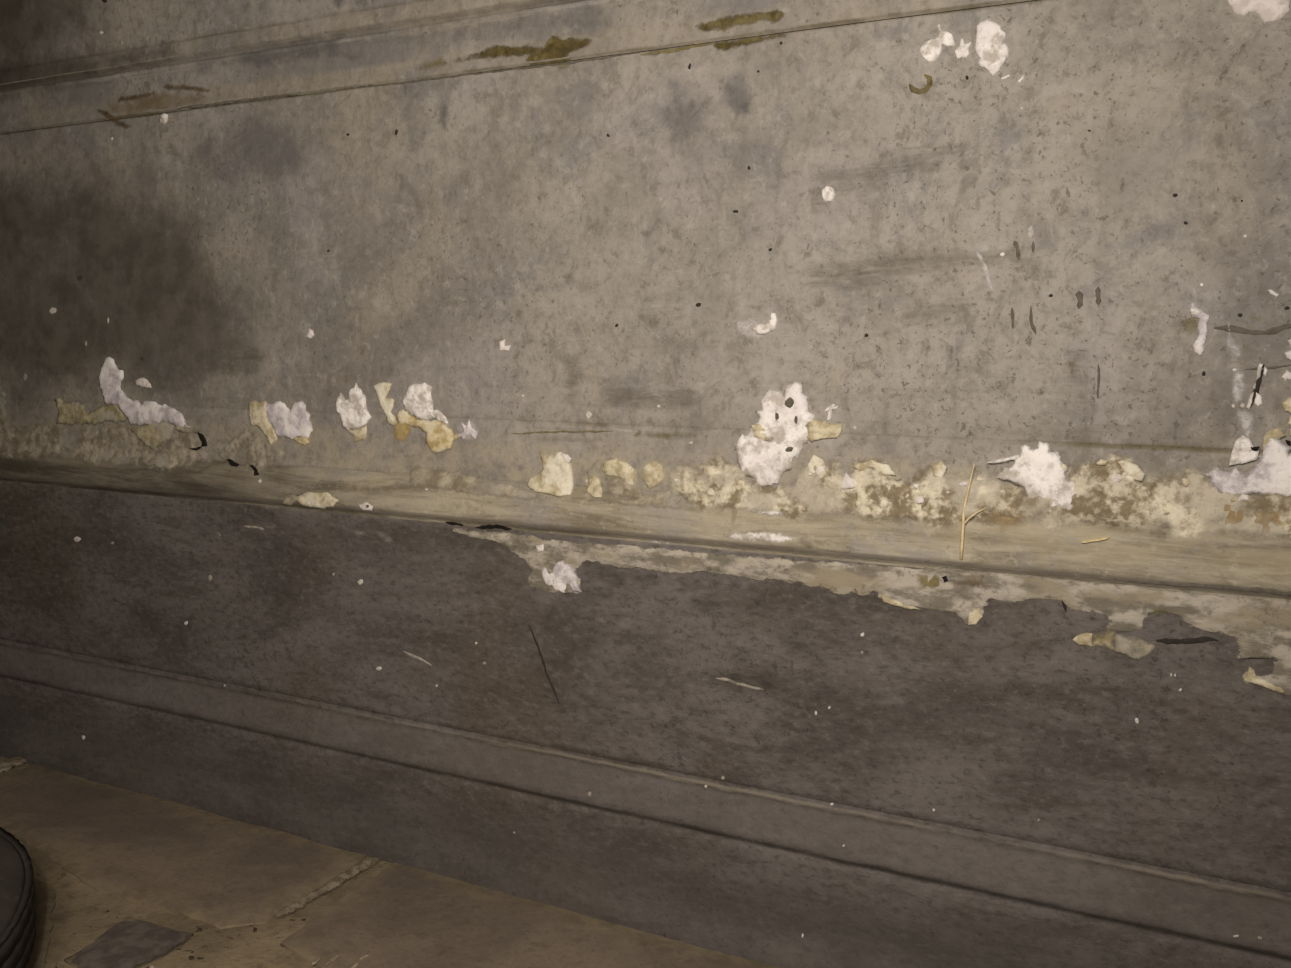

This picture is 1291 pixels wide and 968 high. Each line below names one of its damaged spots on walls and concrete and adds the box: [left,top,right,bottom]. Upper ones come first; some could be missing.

water stain [0,0,90,89]
peeling [919,19,1023,83]
peeling [1227,0,1291,24]
water stain [0,192,221,378]
peeling [1282,339,1291,381]
flaking render [0,357,313,470]
flaking render [335,382,460,453]
flaking render [527,452,665,499]
flaking render [453,528,1291,695]